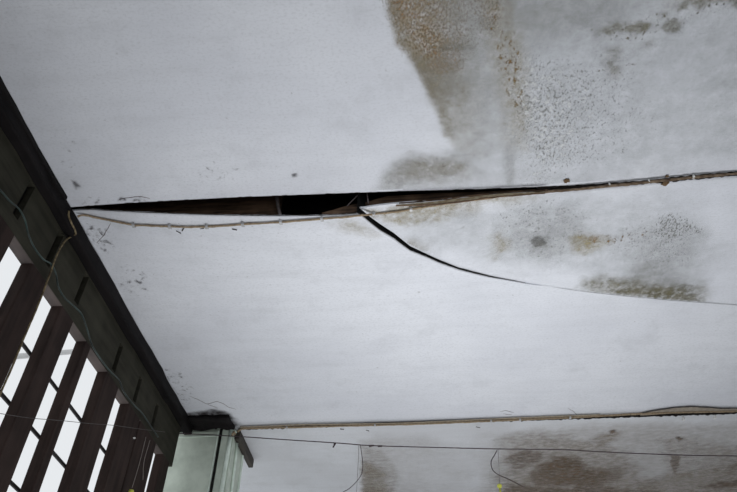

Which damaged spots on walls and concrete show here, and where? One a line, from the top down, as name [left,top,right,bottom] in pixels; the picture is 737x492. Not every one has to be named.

leakage [390,0,499,124]
mould [510,66,595,183]
crack [76,171,737,283]
leakage [591,280,691,300]
leakage [505,456,615,492]